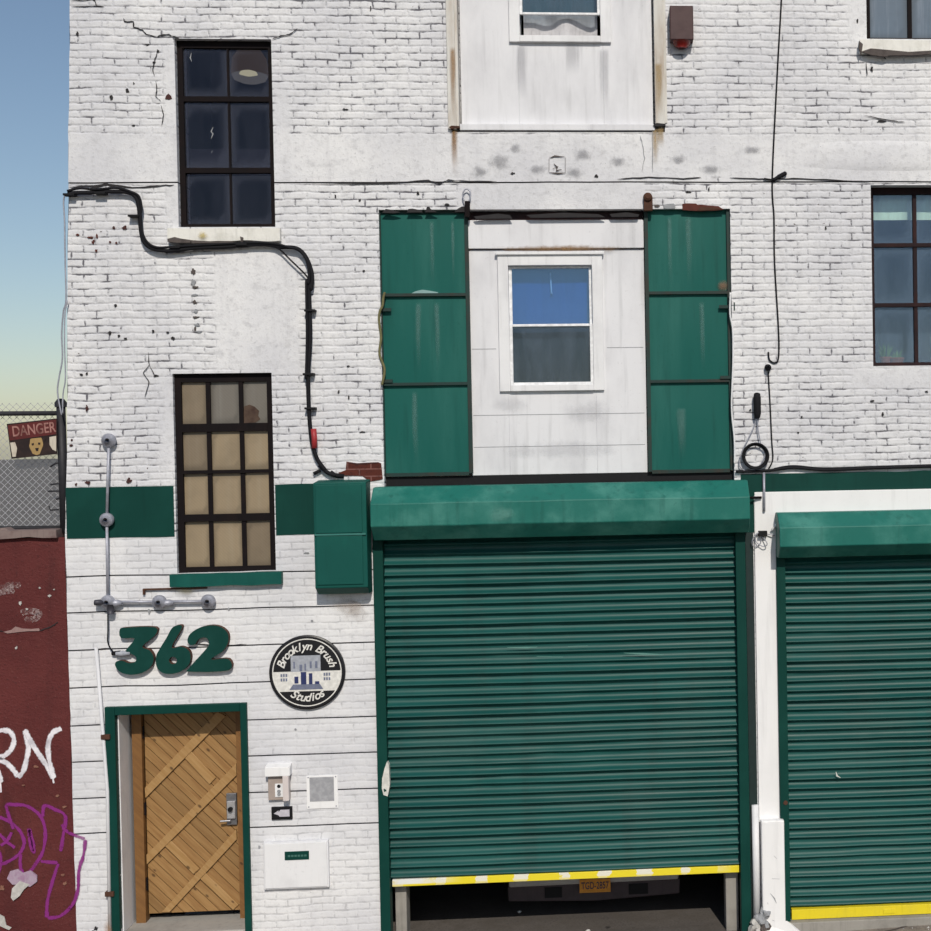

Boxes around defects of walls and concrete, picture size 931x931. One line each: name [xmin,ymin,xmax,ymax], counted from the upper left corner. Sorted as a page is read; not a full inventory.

crack [123,18,179,123]
flaking render [338,462,383,481]